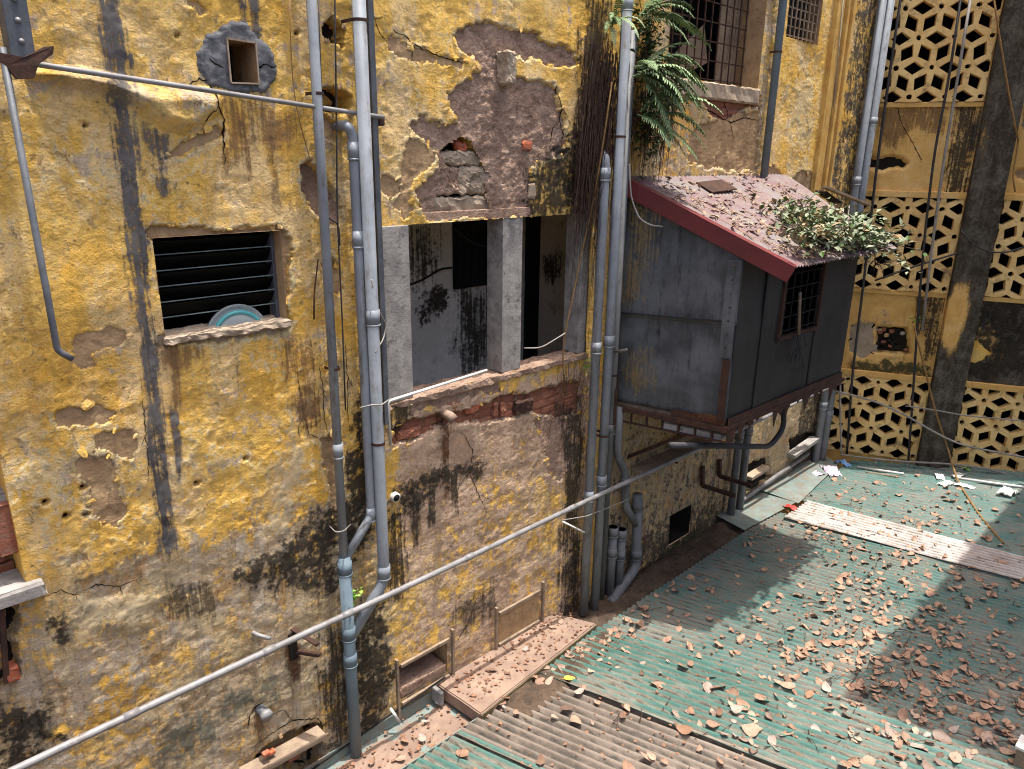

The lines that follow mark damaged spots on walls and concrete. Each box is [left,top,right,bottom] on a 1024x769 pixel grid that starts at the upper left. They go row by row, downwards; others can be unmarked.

crack [190,59,226,166]
spalling [380,21,578,220]
crack [702,77,758,128]
water stain [878,101,983,192]
water stain [87,0,183,556]
water stain [409,224,487,374]
spalling [849,323,909,358]
peeling [55,399,138,530]
crack [457,433,489,513]
spalling [391,380,581,481]
crack [41,576,142,614]
water stain [233,340,487,748]